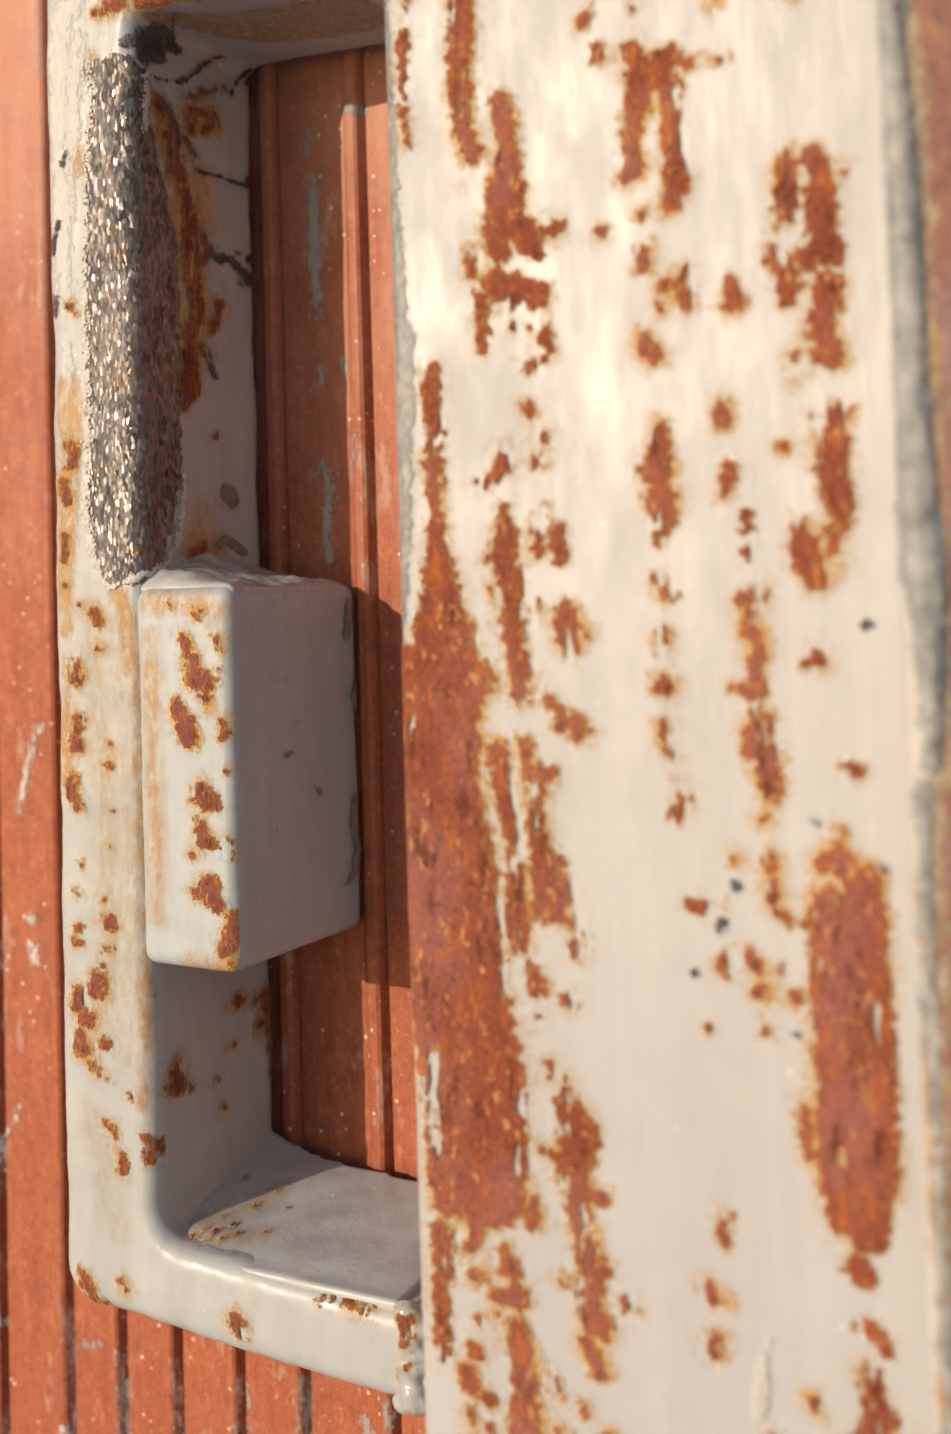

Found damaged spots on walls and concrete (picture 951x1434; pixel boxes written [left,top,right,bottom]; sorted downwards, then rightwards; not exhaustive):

peeling [47,0,191,590]
peeling [209,249,254,300]
rust [441,0,568,376]
rust [571,0,731,371]
rust [761,140,852,385]
rust [56,378,233,891]
peeling [221,484,240,509]
peeling [213,535,248,555]
rust [771,399,859,593]
rust [394,361,642,1434]
rust [724,584,906,1292]
rust [850,1317,900,1434]